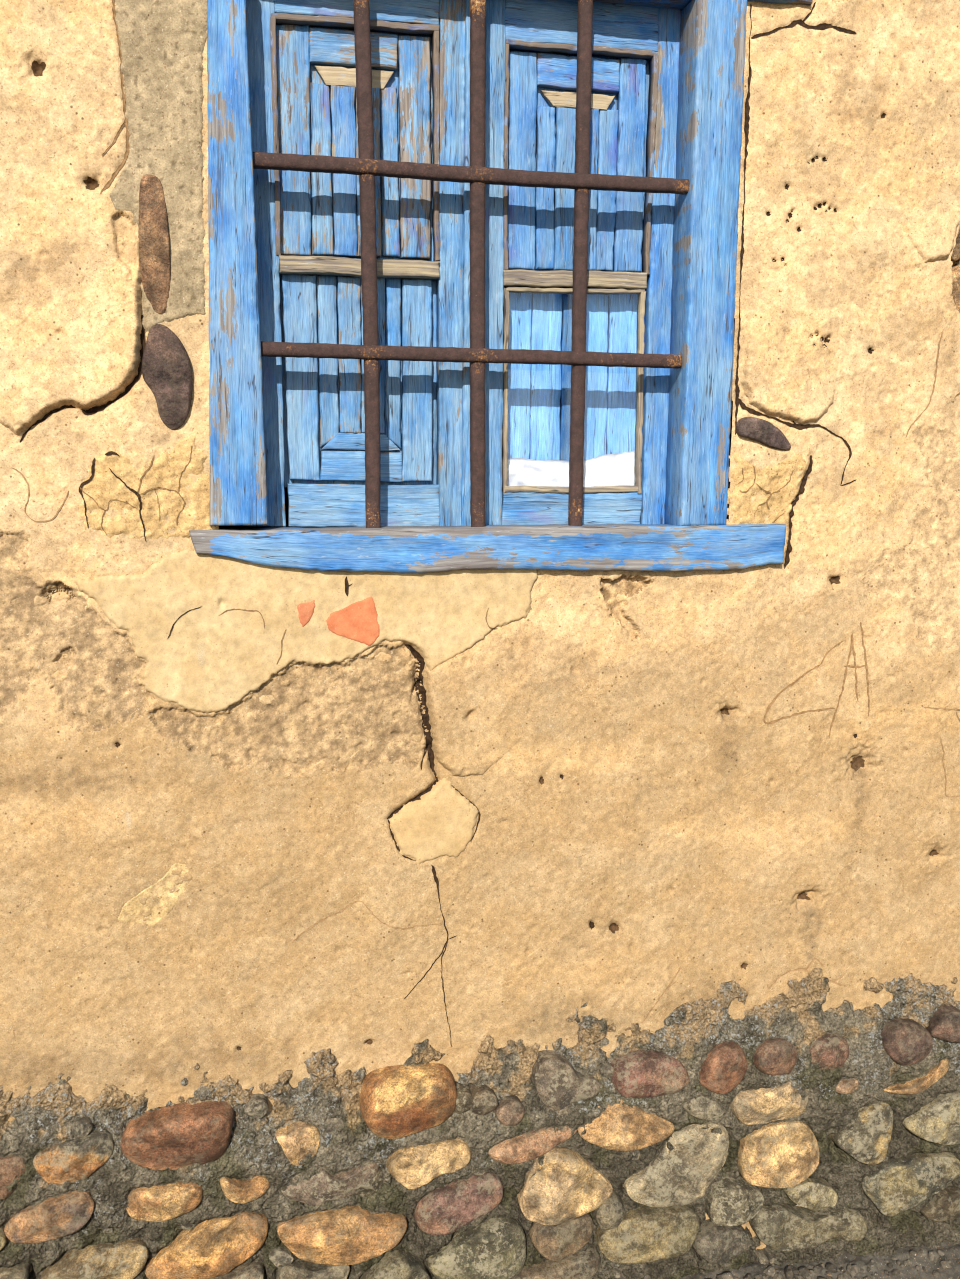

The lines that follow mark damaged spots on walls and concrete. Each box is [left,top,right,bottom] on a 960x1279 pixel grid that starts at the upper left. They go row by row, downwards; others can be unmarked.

crack [11,315,145,522]
crack [735,2,857,569]
spalling [0,528,426,777]
crack [292,644,481,1047]